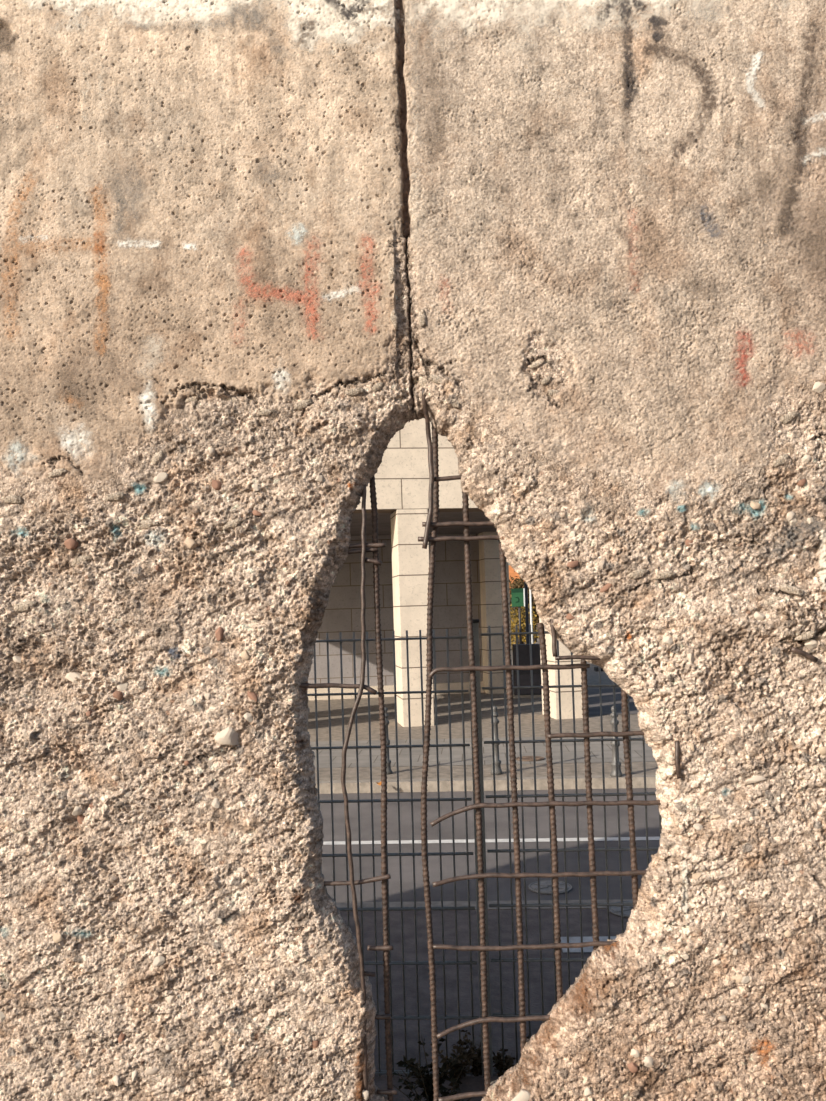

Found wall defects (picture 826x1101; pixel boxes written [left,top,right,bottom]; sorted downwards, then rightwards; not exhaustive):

rust [355,1055,369,1101]
spalling [0,242,826,1101]